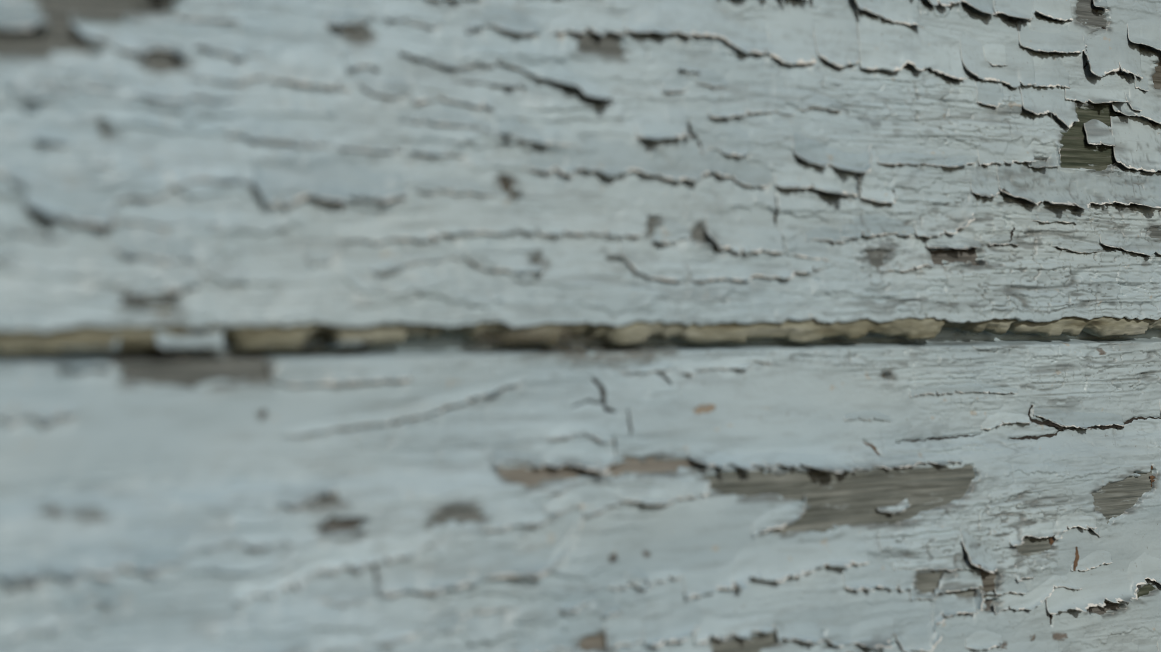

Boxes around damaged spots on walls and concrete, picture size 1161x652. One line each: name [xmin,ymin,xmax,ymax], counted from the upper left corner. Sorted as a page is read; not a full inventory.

peeling [0,0,1161,314]
peeling [48,330,414,389]
peeling [620,356,773,375]
peeling [0,444,1161,652]